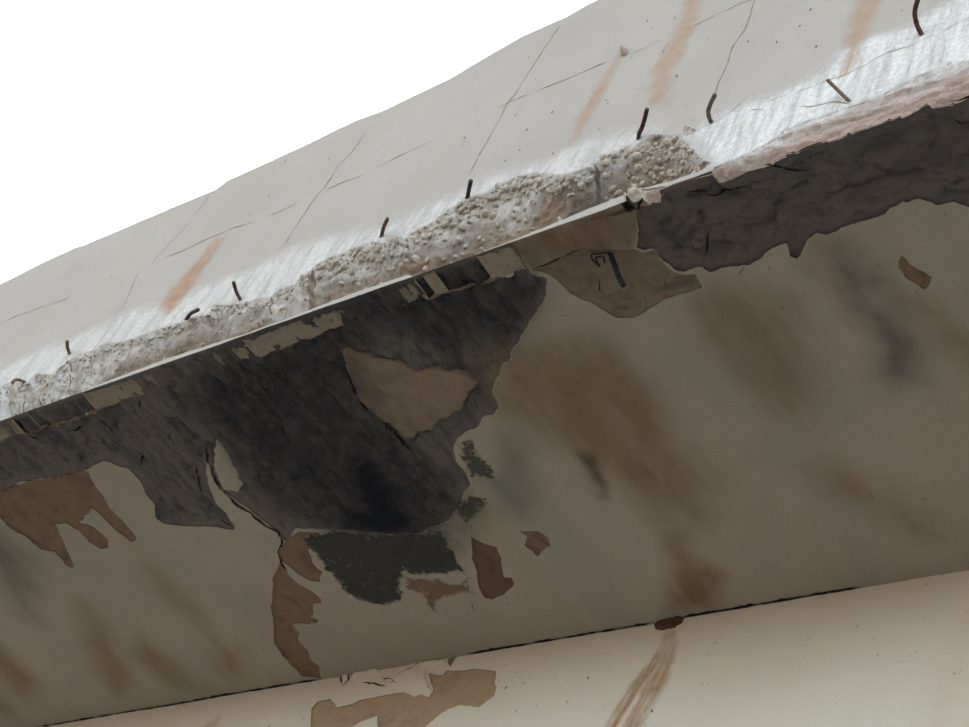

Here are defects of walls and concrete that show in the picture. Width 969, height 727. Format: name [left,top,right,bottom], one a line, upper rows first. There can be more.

spalling [912,0,924,36]
spalling [0,64,969,582]
peeling [471,537,514,599]
peeling [270,564,321,679]
peeling [303,658,507,727]